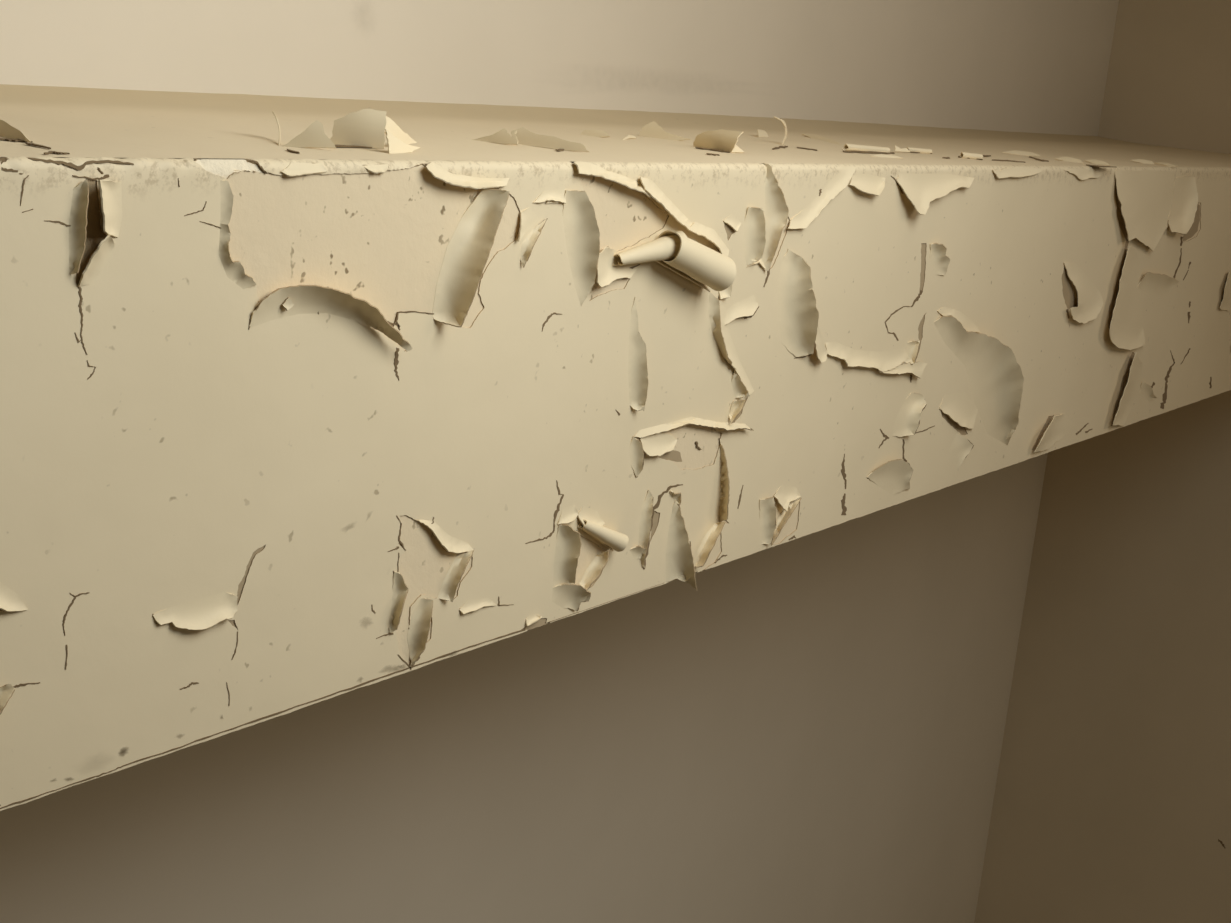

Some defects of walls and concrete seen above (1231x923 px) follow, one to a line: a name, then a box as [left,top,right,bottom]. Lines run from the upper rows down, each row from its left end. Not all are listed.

peeling [757,116,817,151]
peeling [69,179,122,379]
peeling [193,120,693,415]
peeling [992,150,1201,426]
peeling [629,145,1024,590]
peeling [0,582,28,612]
peeling [0,682,40,715]
peeling [152,545,265,660]
crack [0,583,663,809]
peeling [376,515,514,669]
peeling [523,614,549,630]
peeling [552,524,610,611]